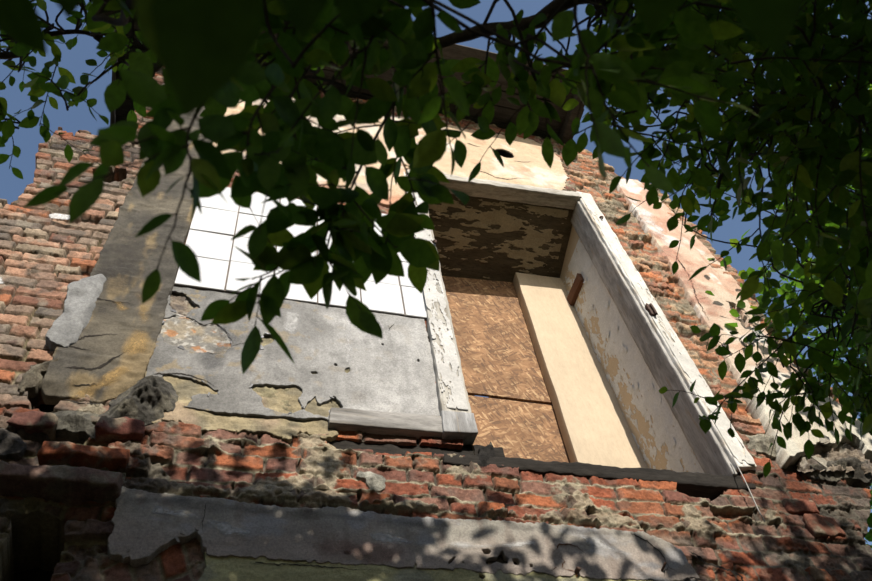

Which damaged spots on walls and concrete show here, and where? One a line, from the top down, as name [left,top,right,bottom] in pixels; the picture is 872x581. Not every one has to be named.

spalling [161,290,232,354]
spalling [260,332,274,350]
peeling [407,192,569,410]
peeling [563,192,755,473]
crack [64,334,127,404]
spalling [36,404,56,413]
spalling [249,384,303,414]
spalling [79,526,205,581]
crack [254,562,374,571]
crack [631,533,743,581]